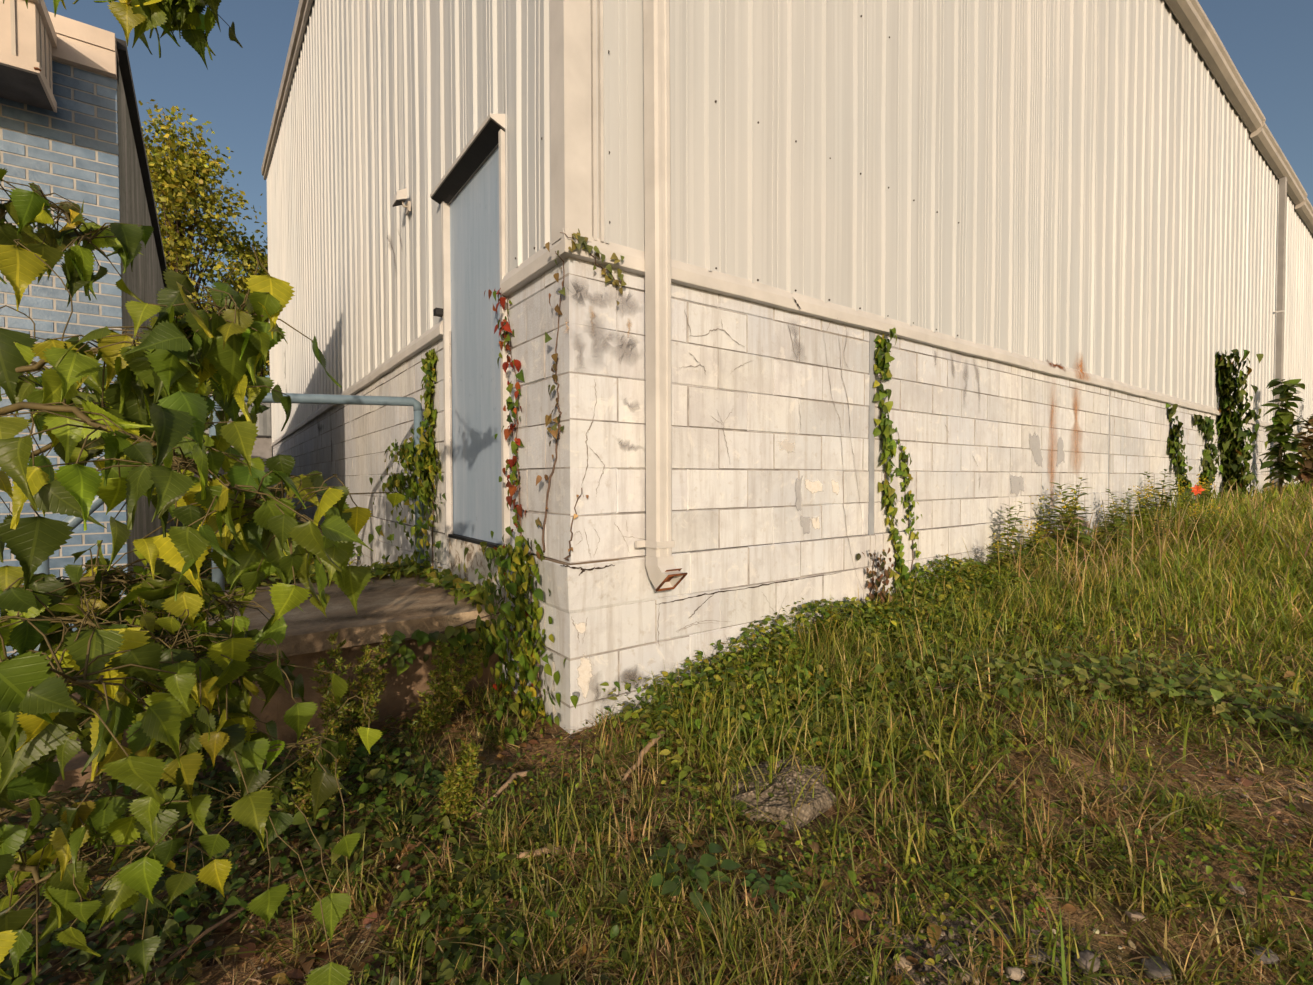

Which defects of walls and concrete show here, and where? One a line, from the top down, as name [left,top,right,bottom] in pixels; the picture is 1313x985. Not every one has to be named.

leakage [577,290,634,361]
crack [681,313,748,374]
crack [582,379,605,497]
peeling [795,478,839,534]
crack [657,572,841,649]
peeling [577,657,593,698]